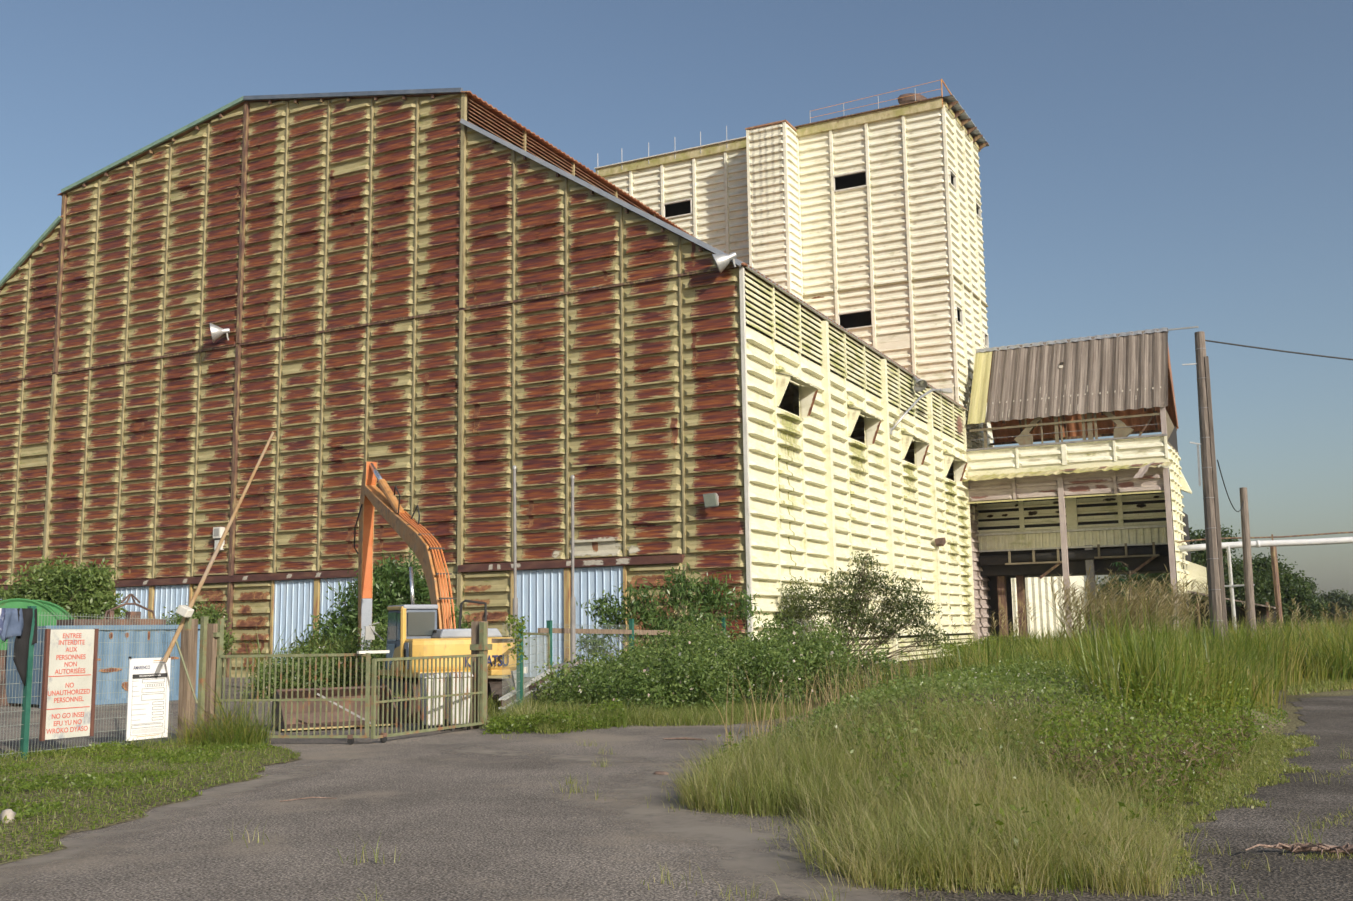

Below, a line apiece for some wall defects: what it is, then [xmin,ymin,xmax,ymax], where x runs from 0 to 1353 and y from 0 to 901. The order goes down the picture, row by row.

rust [0,99,747,667]
rust [97,659,128,691]